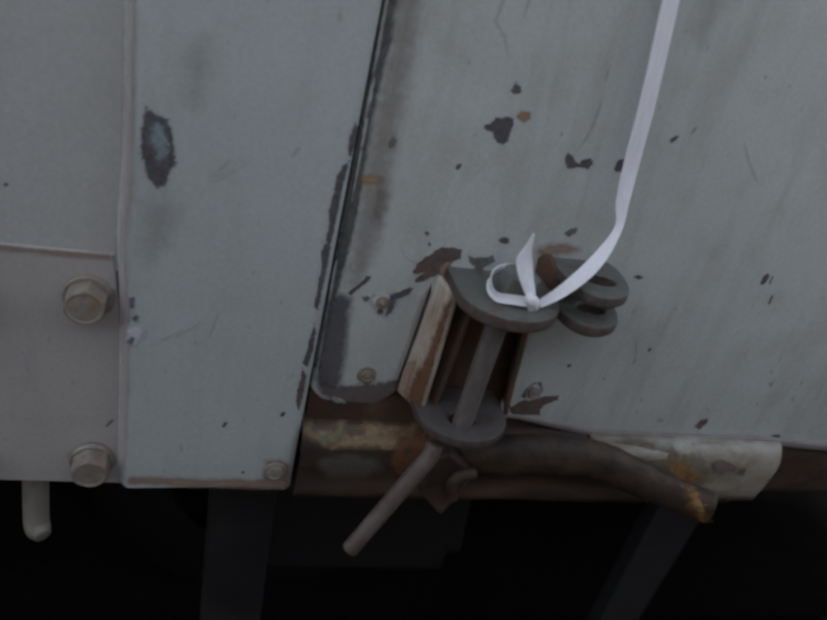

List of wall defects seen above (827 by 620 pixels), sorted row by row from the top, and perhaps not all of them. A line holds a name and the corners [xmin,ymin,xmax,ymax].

peeling [139,106,178,189]
peeling [484,116,514,145]
peeling [565,153,593,170]
peeling [314,123,369,310]
peeling [348,247,495,316]
peeling [296,326,316,409]
rust [305,419,437,477]